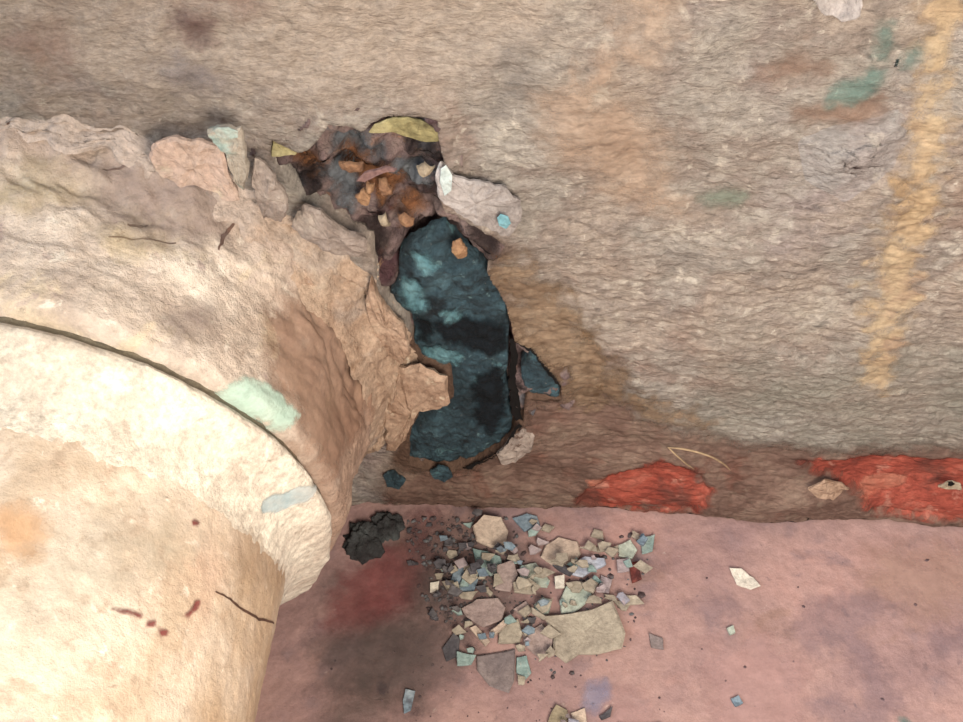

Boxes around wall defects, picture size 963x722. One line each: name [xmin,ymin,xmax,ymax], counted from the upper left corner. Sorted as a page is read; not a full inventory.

spalling [207,115,575,482]
spalling [383,470,406,490]
peeling [574,460,714,514]
peeling [796,455,963,523]
crack [215,591,274,624]